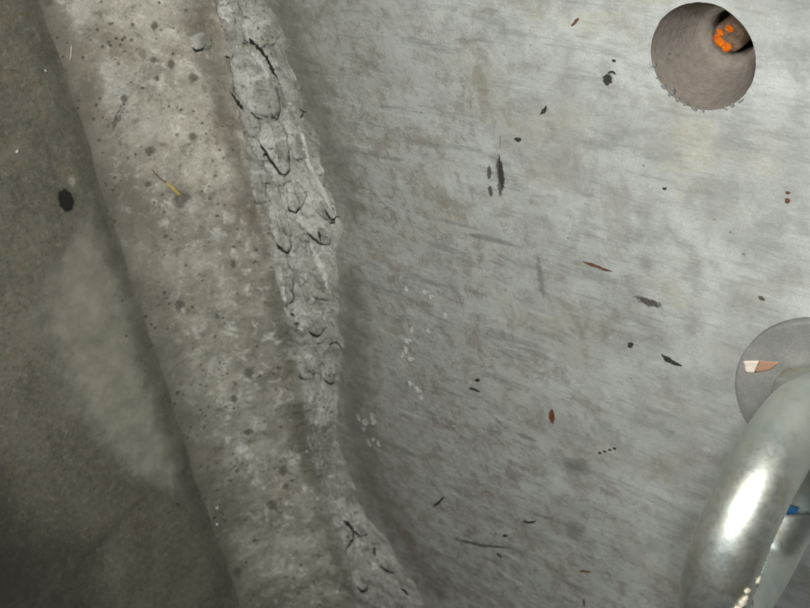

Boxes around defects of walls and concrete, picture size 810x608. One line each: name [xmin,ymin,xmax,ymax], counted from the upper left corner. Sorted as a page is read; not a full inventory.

rust [711,25,734,52]
crack [249,38,279,81]
crack [230,92,263,120]
crack [257,139,289,175]
crack [307,207,340,245]
crack [290,313,342,349]
leakage [44,230,180,492]
crack [343,520,408,595]